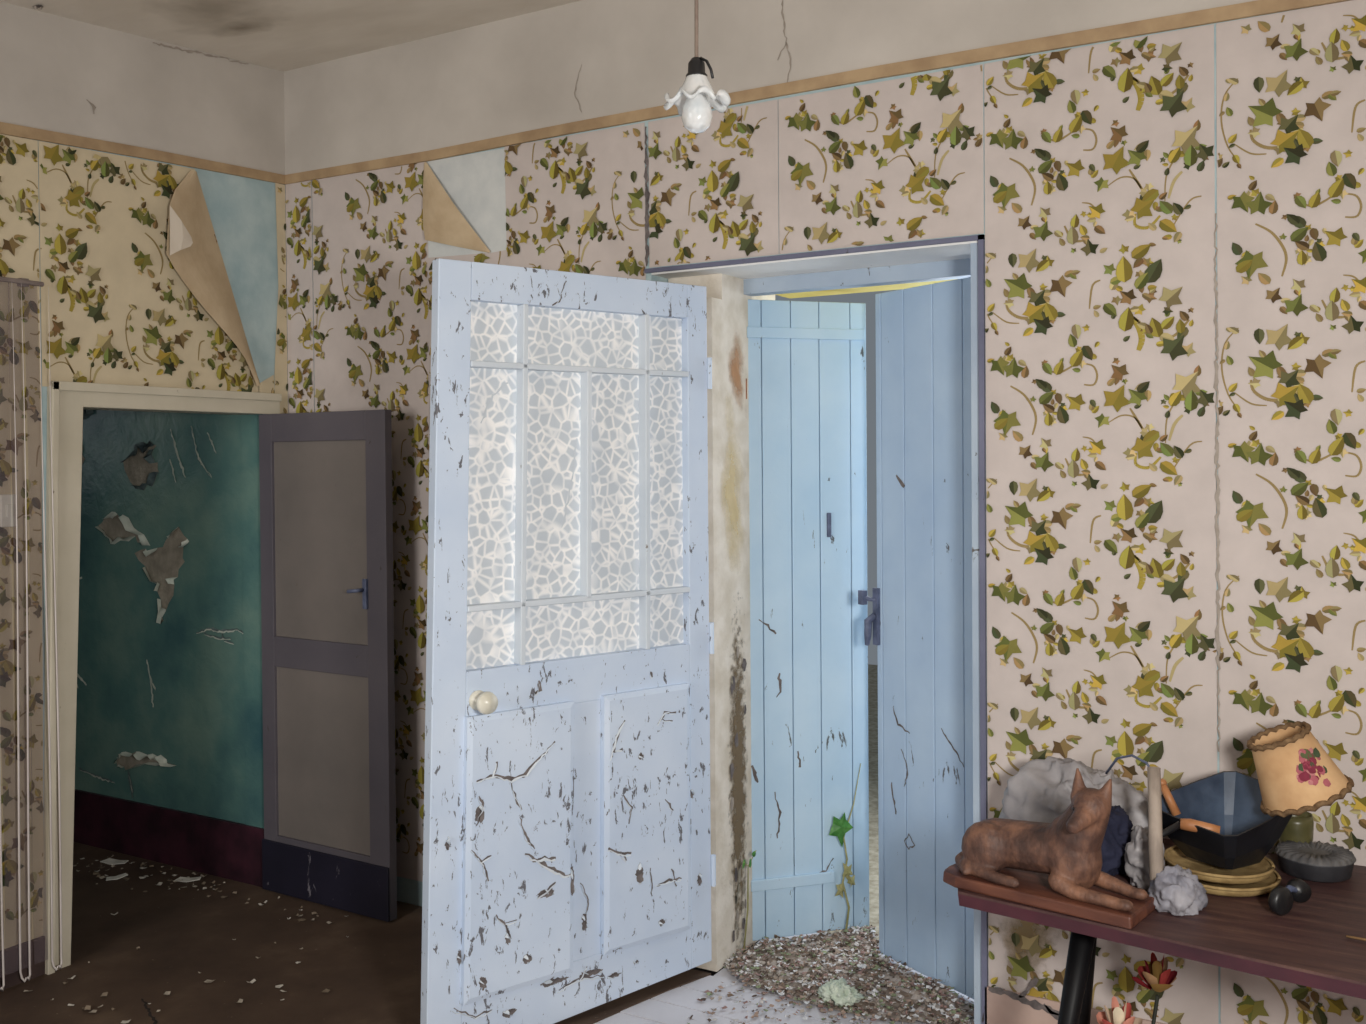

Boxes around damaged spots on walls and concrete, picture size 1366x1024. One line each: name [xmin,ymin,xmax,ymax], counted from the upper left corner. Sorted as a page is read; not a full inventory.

peeling [427,148,507,258]
peeling [122,440,159,490]
peeling [96,512,189,624]
peeling [114,751,177,770]